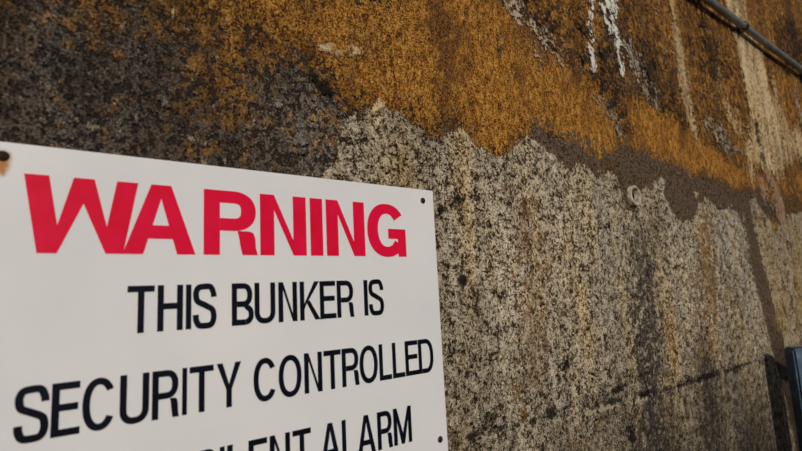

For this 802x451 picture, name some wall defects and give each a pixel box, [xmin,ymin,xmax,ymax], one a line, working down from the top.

leakage [508,0,802,451]